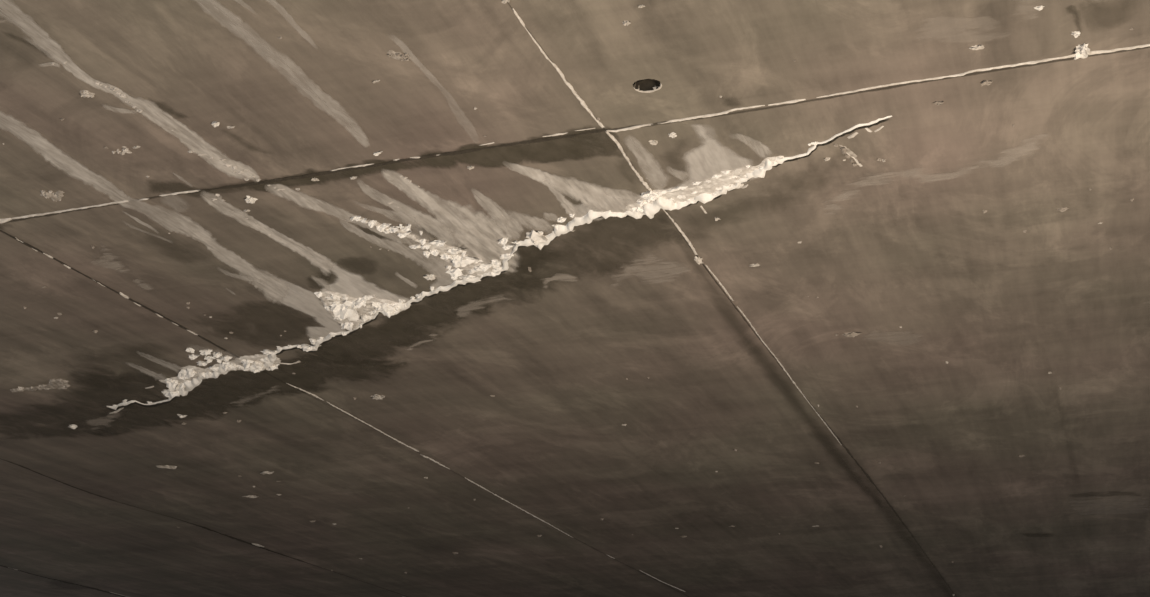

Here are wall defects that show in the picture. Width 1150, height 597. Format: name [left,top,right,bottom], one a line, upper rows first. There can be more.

water stain [0,7,784,437]
crack [107,116,892,414]